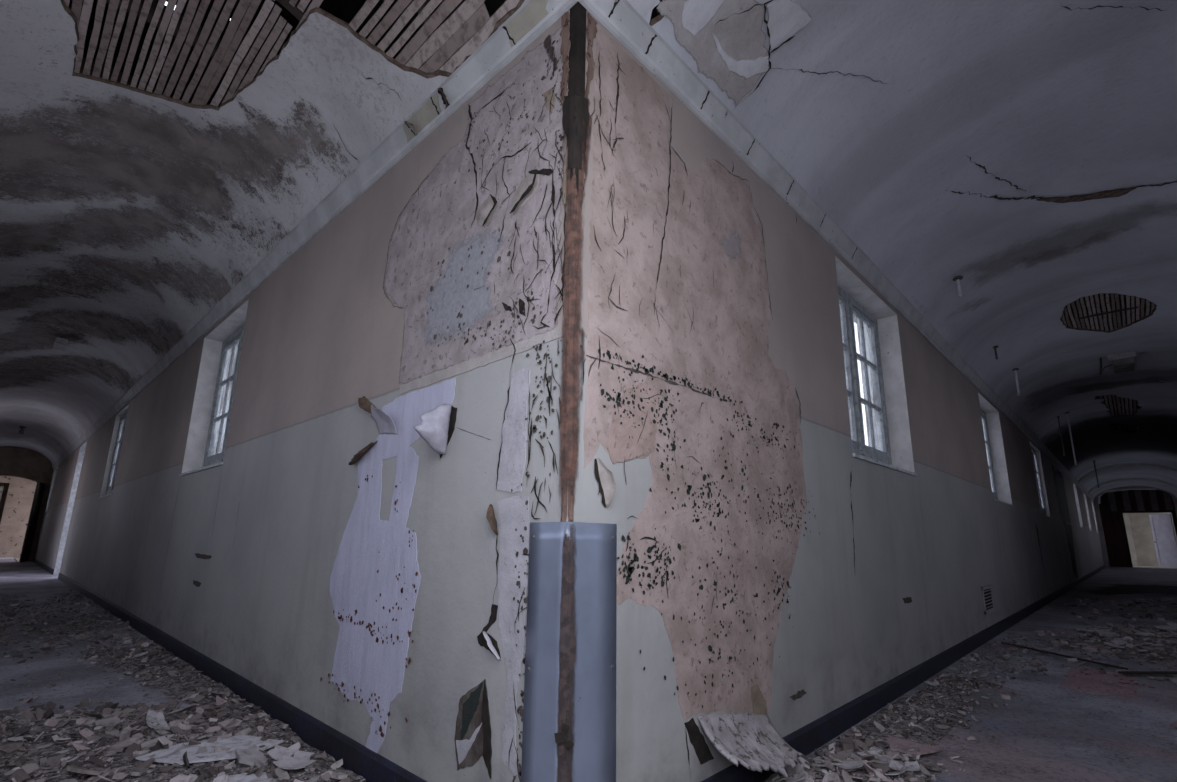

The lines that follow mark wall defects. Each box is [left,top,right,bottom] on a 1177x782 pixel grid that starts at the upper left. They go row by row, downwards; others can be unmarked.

crack [716,0,888,107]
crack [365,34,705,519]
corrosion [559,115,592,497]
crack [715,139,773,320]
crack [945,155,1177,200]
peeling [0,0,820,779]
crack [493,538,529,622]
crack [626,516,680,594]
crack [848,474,856,567]
corrosion [557,527,577,782]
crack [509,683,521,782]